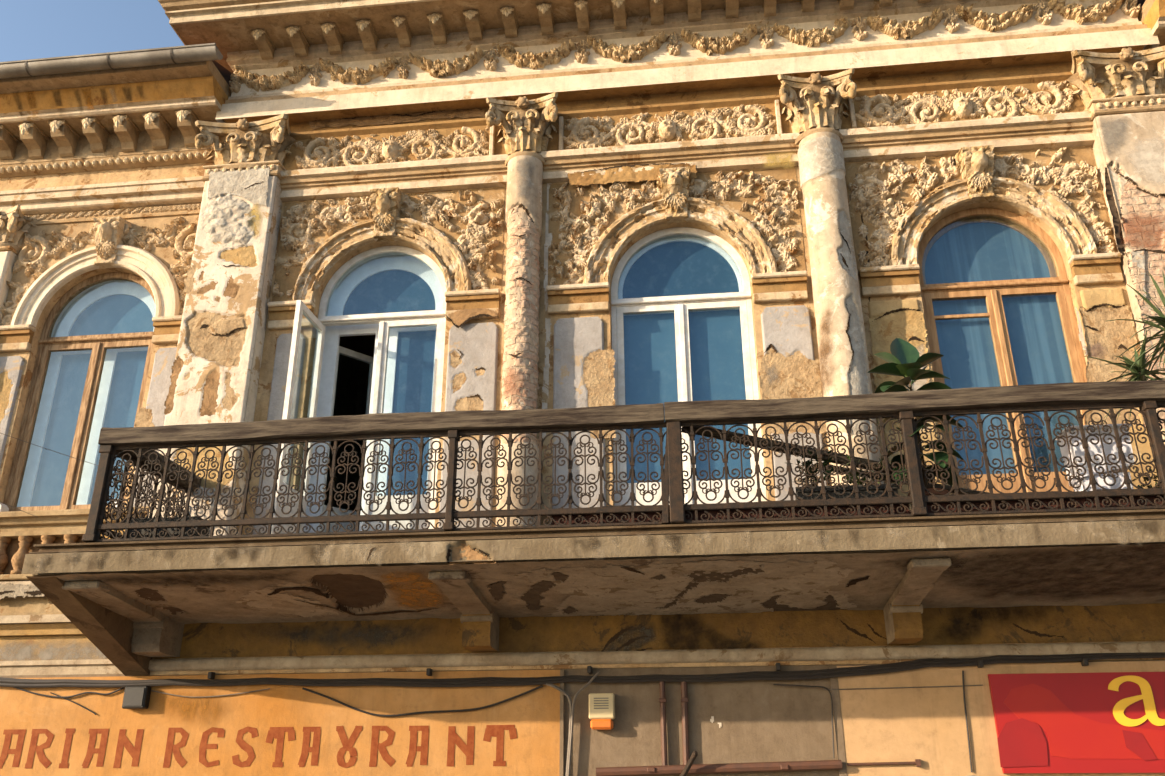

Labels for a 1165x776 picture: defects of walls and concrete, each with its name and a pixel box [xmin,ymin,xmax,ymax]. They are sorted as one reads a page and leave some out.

flaking render [208,167,270,205]
spalling [567,163,697,186]
crack [1111,162,1165,198]
flaking render [1075,120,1165,382]
crack [1127,246,1165,254]
flaking render [446,183,554,411]
flaking render [134,245,258,427]
peeling [583,349,616,407]
flaking render [1085,408,1165,428]
flaking render [500,433,546,447]
flaking render [0,583,44,599]
spalling [268,573,438,616]